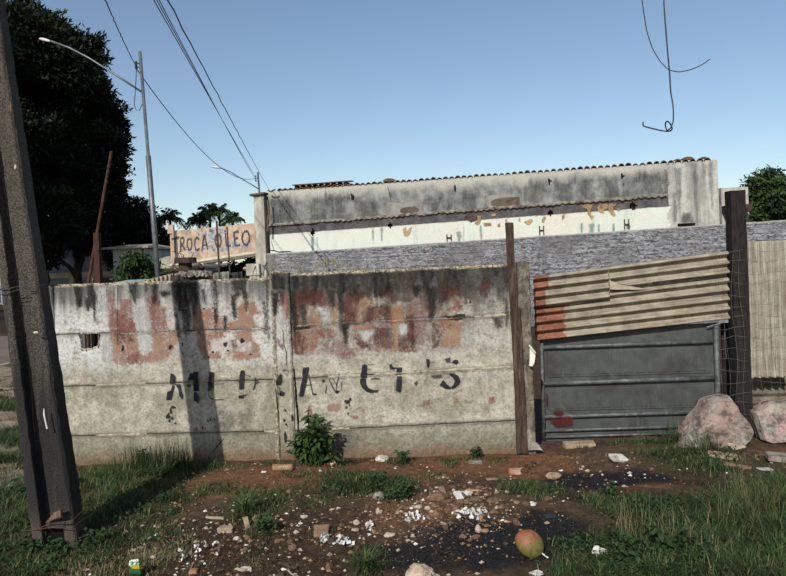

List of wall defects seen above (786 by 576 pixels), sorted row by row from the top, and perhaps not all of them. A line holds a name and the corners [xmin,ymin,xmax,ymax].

water stain [74,284,96,319]
peeling [79,281,260,365]
water stain [129,278,248,336]
water stain [263,247,465,344]
water stain [493,299,508,328]